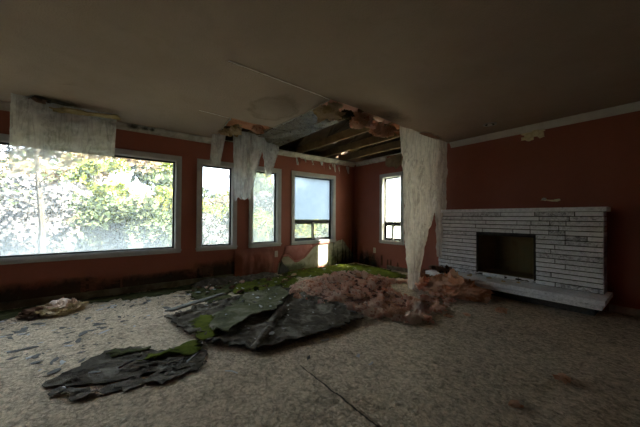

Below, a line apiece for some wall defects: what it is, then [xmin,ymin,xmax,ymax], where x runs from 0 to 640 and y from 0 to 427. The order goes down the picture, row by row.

peeling [277,242,333,274]
mould [331,239,379,267]
damp [0,261,234,302]